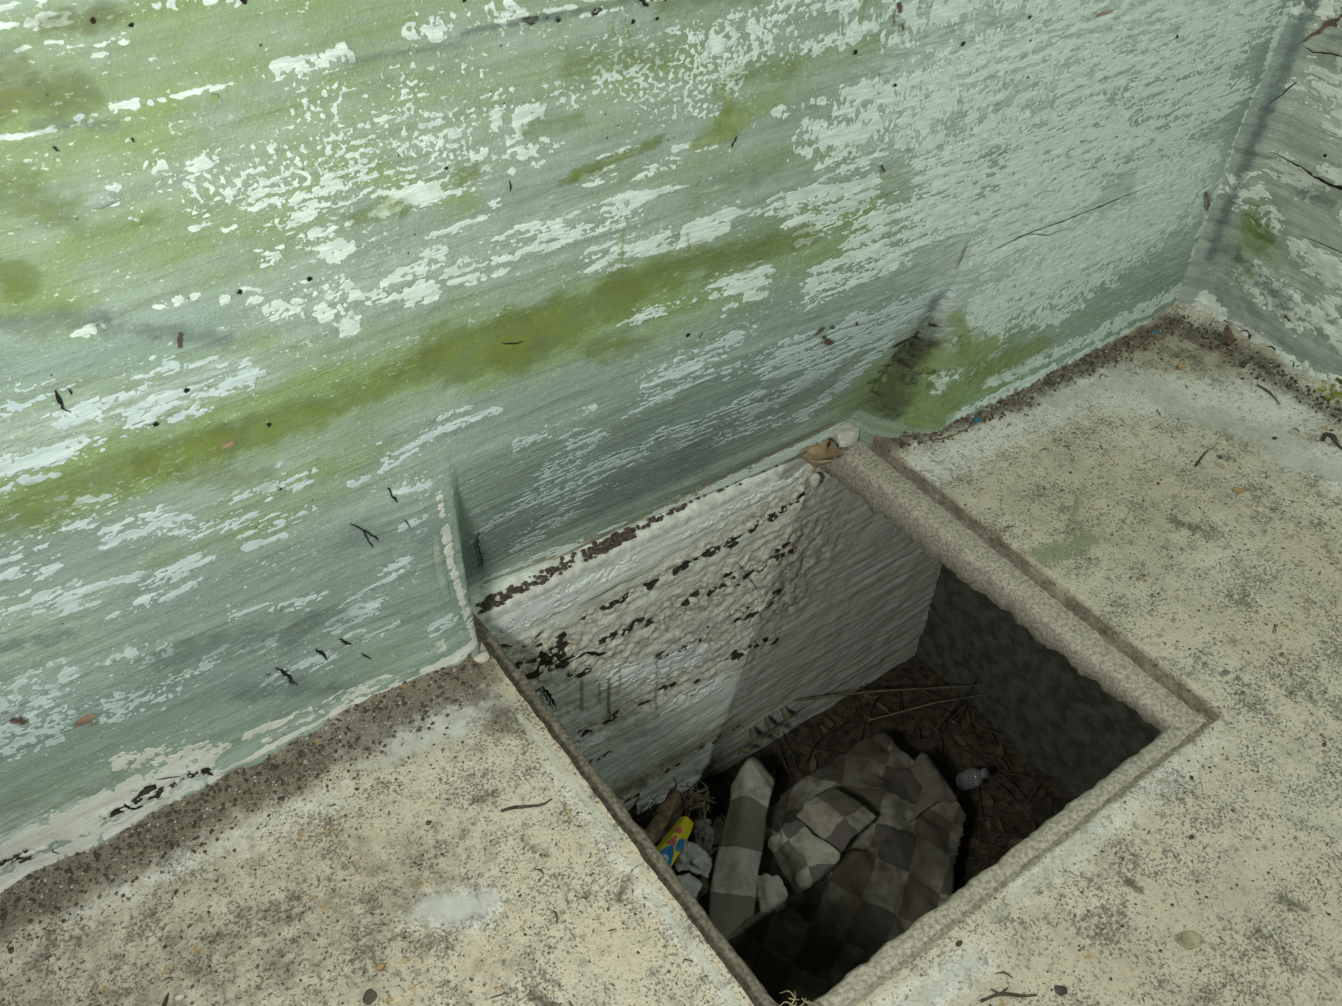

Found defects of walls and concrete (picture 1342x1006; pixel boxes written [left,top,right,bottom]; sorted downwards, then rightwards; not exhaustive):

peeling [182,41,591,264]
peeling [219,142,719,339]
damp [560,137,659,183]
damp [690,86,751,149]
crack [1272,152,1342,190]
peeling [0,355,267,494]
damp [420,271,673,381]
damp [875,310,1051,430]
peeling [944,283,1182,425]
peeling [0,446,320,622]
damp [484,422,834,584]
peeling [0,591,329,763]